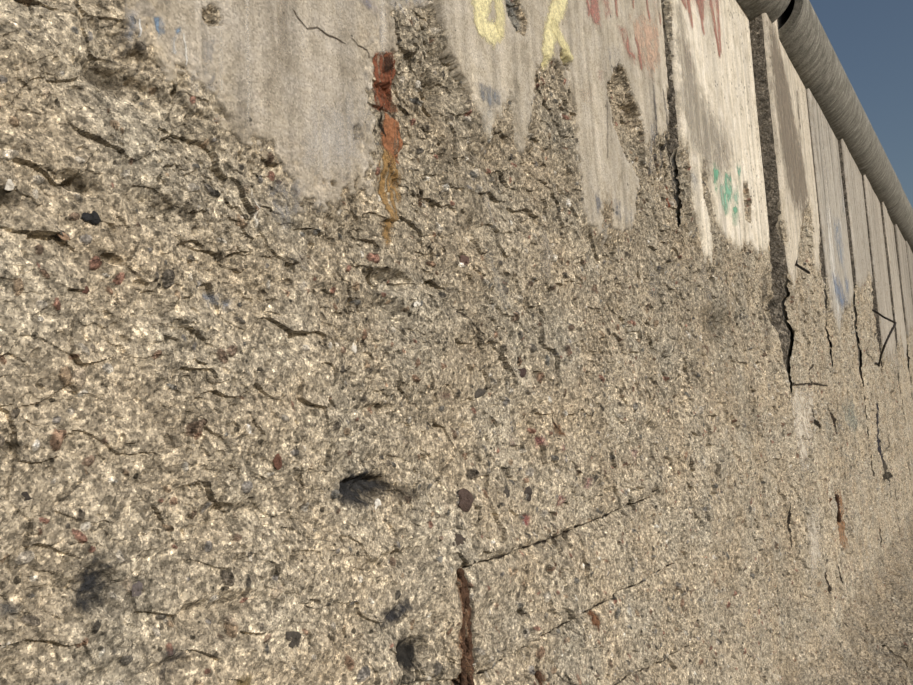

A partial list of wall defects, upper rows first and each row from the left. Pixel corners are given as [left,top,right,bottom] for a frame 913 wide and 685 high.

spalling [505,0,528,36]
spalling [663,1,673,43]
corrosion [373,52,403,243]
spalling [0,0,475,685]
spalling [419,60,913,685]
crack [876,403,893,497]
crack [462,489,659,568]
crack [476,558,679,674]